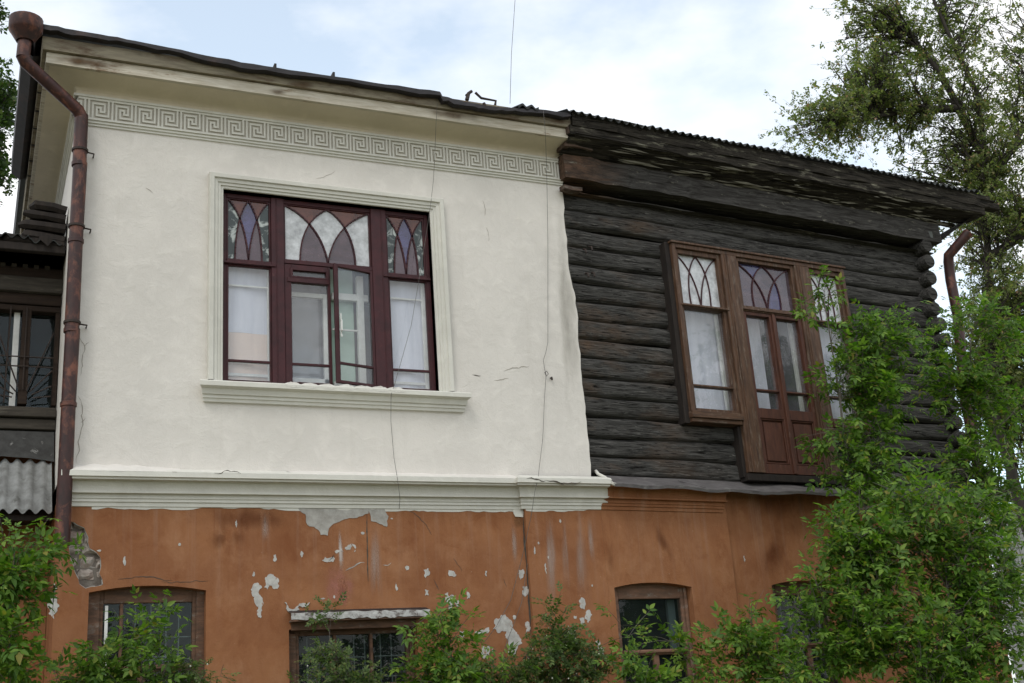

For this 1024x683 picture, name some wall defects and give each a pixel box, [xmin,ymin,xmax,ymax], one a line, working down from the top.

flaking render [298,508,393,536]
flaking render [69,522,103,588]
peeling [251,554,279,618]
peeling [460,615,531,654]